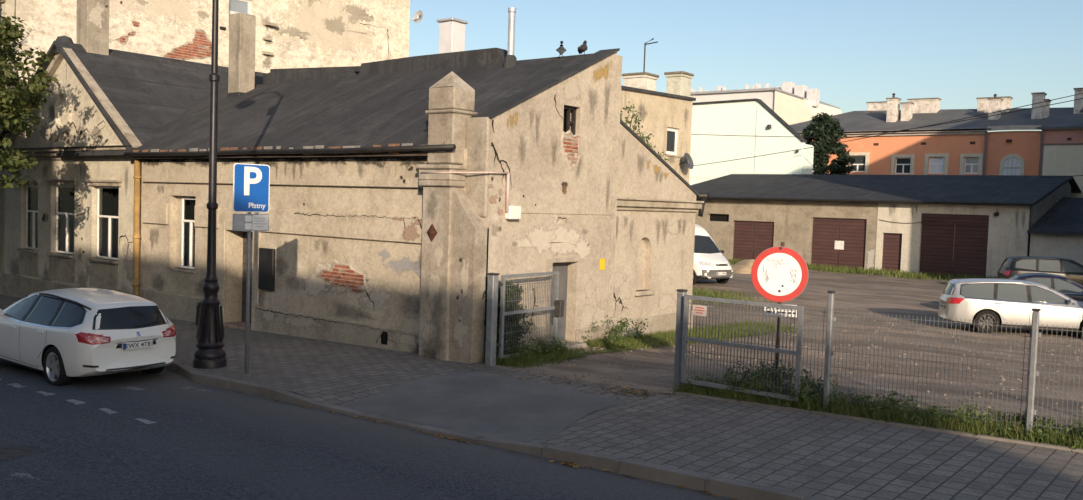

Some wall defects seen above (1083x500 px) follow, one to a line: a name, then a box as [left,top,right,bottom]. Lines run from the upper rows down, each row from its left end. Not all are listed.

flaking render [560,130,581,191]
flaking render [303,259,392,311]